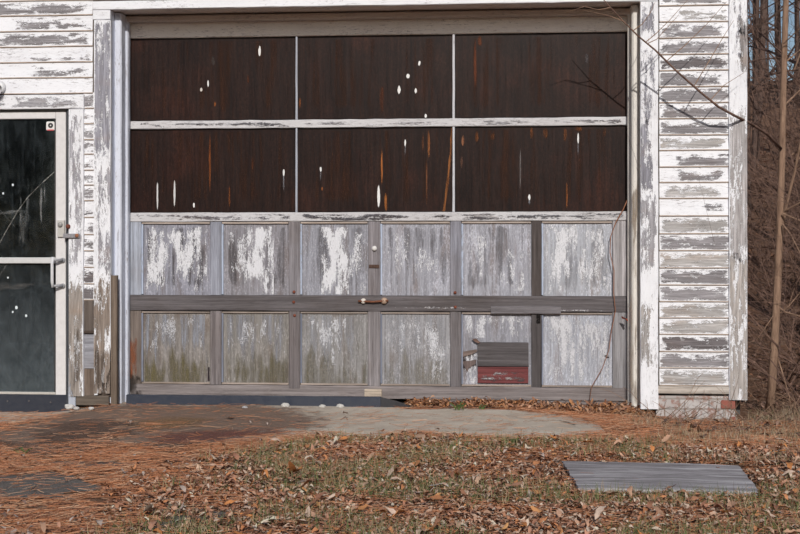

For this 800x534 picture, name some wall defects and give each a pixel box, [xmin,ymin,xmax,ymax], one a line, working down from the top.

peeling [0,2,110,396]
peeling [138,181,240,291]
peeling [228,214,290,294]
peeling [303,186,623,295]
peeling [641,0,747,399]
peeling [151,318,176,352]
peeling [228,320,285,346]
peeling [306,318,346,365]
peeling [392,317,446,379]
peeling [463,308,527,384]
peeling [546,310,612,383]